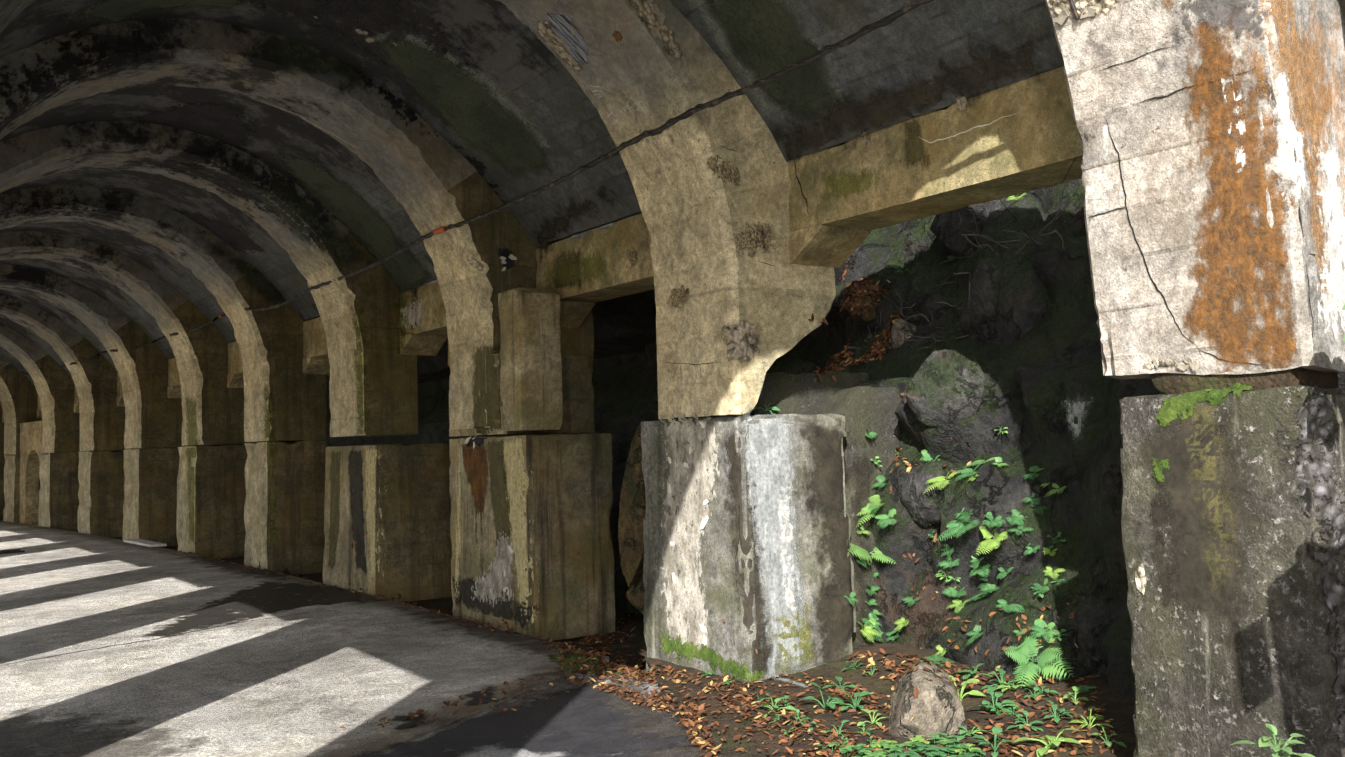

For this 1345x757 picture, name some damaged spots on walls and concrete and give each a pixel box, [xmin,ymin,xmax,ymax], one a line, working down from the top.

spalling [537,14,588,71]
spalling [629,0,682,59]
spalling [1048,0,1118,25]
crack [1140,85,1196,103]
damp [0,195,133,224]
crack [1000,117,1262,365]
corrosion [462,443,488,542]
peeling [471,531,516,607]
damp [725,414,879,687]